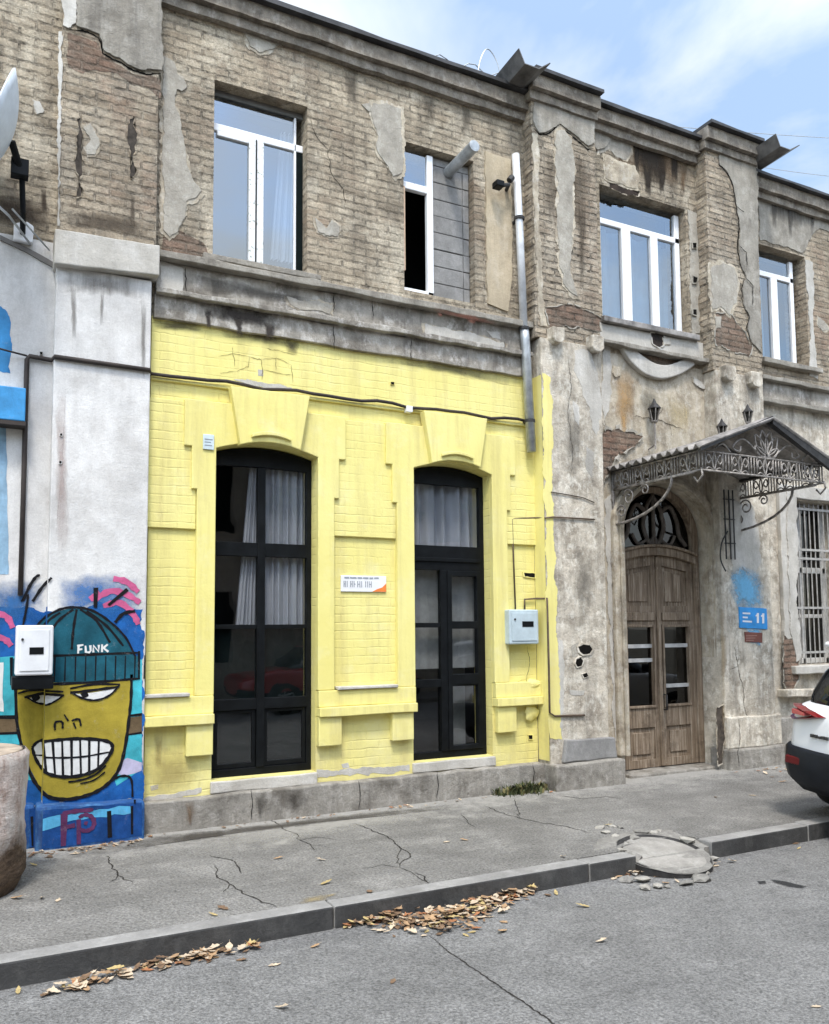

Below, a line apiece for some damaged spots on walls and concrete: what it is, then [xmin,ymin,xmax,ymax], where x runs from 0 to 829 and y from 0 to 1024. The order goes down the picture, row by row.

crack [66,28,161,75]
flaking render [32,0,208,291]
damp [619,147,685,192]
flaking render [531,101,640,332]
crack [718,158,753,343]
flaking render [687,154,829,379]
damp [213,283,286,299]
damp [206,306,295,351]
crack [222,348,293,379]
peeling [573,346,643,484]
peeling [317,763,410,778]